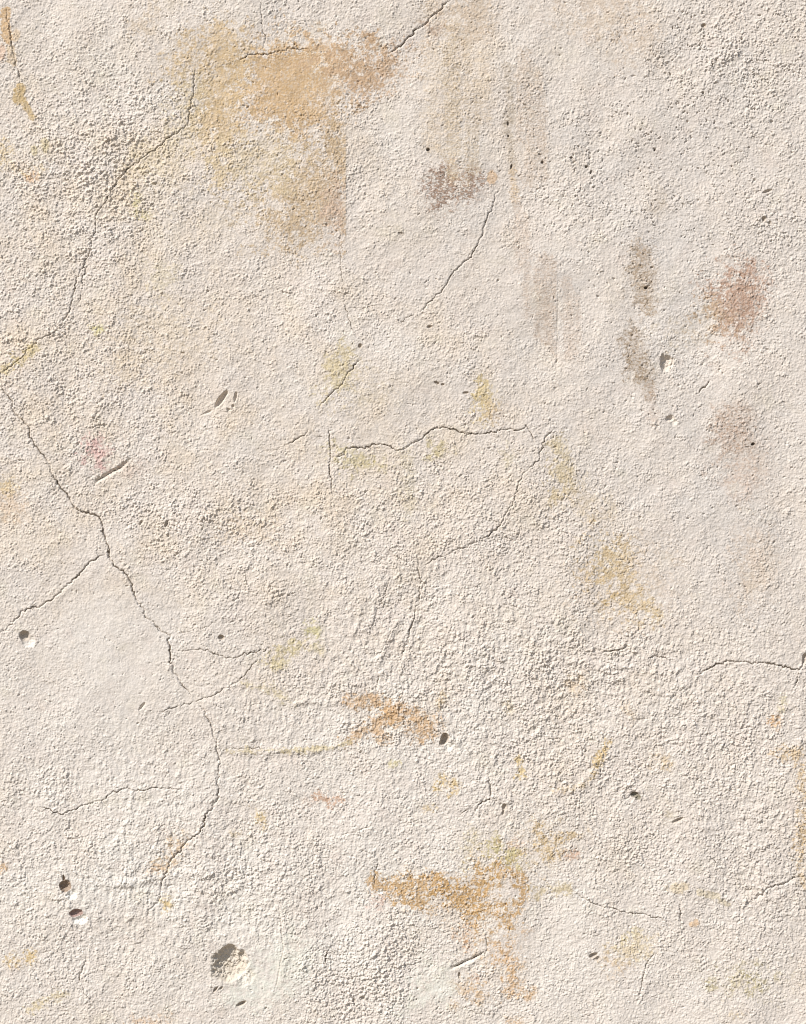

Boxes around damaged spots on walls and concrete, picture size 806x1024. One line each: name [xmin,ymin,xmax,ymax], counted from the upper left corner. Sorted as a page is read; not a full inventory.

water stain [66,0,680,433]
crack [400,204,494,324]
crack [1,55,266,911]
rust [224,686,452,771]
crack [260,425,556,692]
crack [697,661,804,692]
rust [357,734,619,1024]